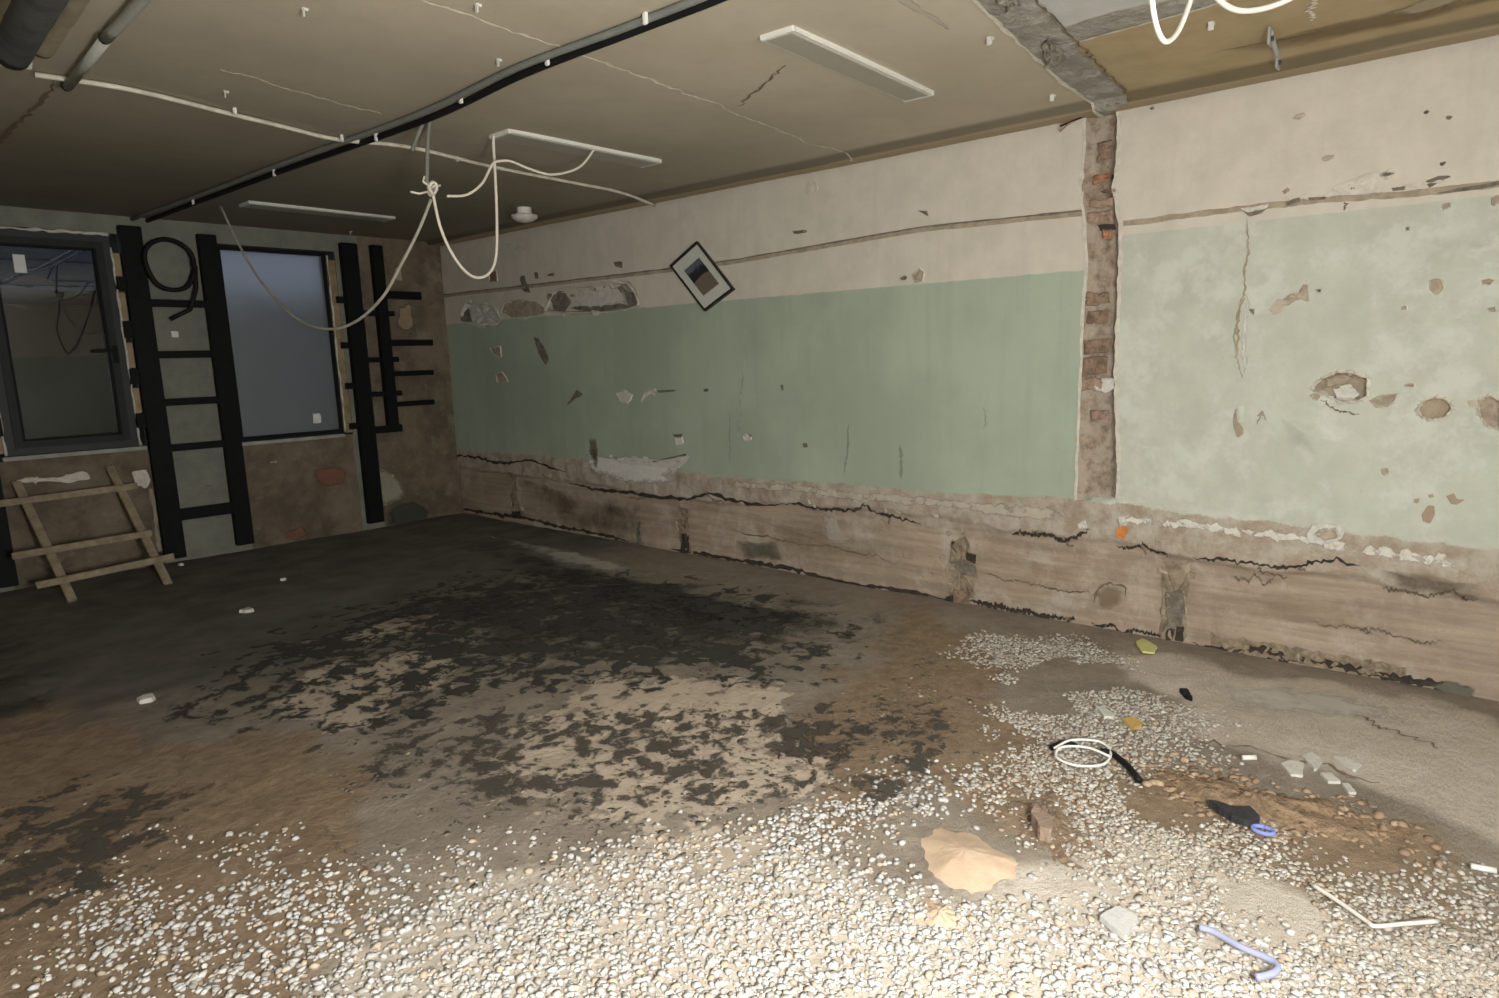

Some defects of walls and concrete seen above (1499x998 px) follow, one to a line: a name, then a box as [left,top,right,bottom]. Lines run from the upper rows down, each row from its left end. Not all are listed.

crack [456,454,1477,691]
crack [1233,224,1266,437]
flaking render [1074,111,1456,569]
peeling [1414,494,1464,523]
spalling [1475,392,1499,431]
damp [150,542,958,820]
crack [1354,715,1438,748]